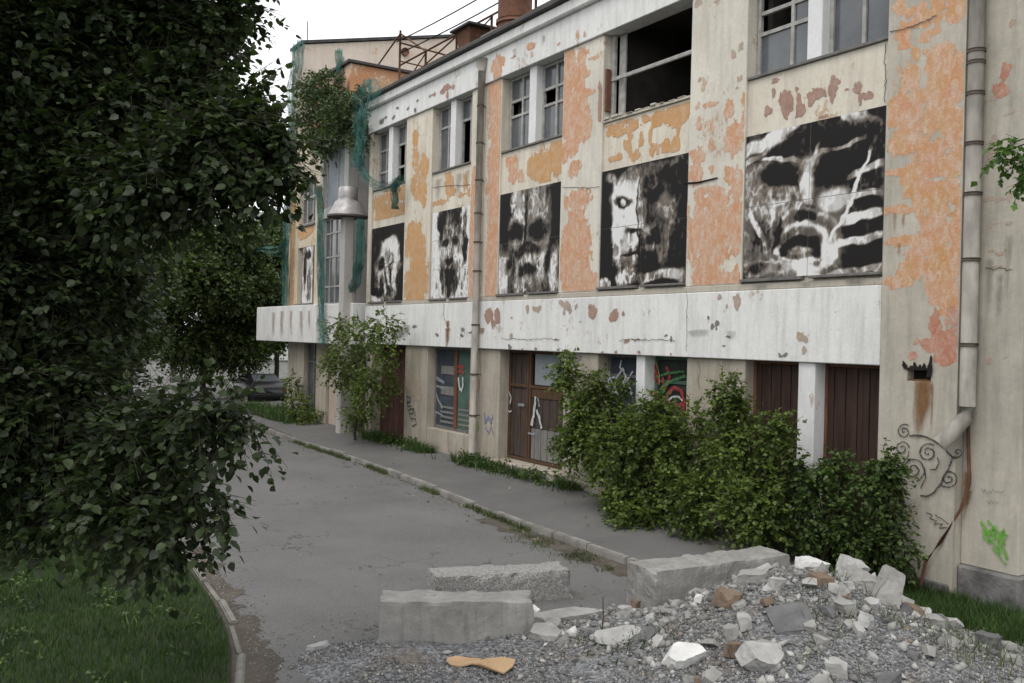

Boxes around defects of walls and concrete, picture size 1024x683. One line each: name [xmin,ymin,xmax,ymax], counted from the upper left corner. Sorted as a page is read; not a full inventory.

peeling [764,75,874,120]
spalling [990,62,1013,101]
peeling [373,30,745,329]
peeling [882,0,966,367]
corrosion [915,380,933,426]